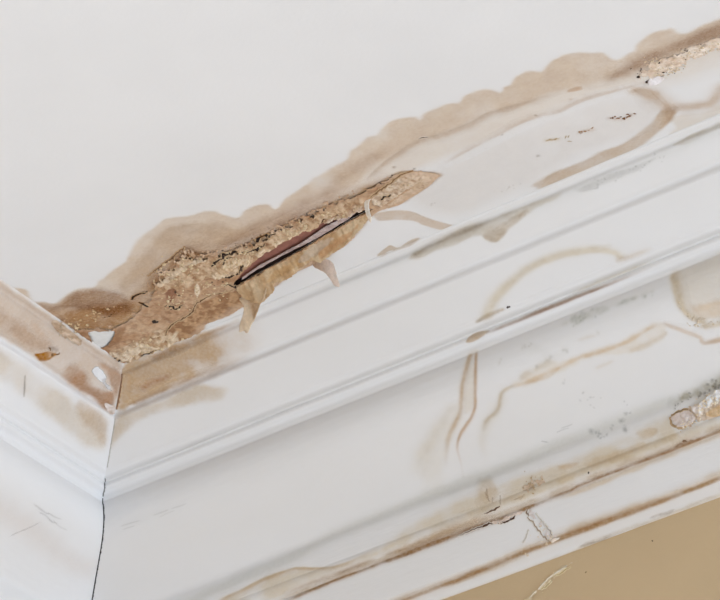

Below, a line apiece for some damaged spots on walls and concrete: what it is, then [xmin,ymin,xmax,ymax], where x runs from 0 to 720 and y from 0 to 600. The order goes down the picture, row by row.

spalling [630,37,720,86]
spalling [51,170,439,363]
peeling [92,367,111,390]
spalling [669,389,720,442]
crack [92,374,124,600]